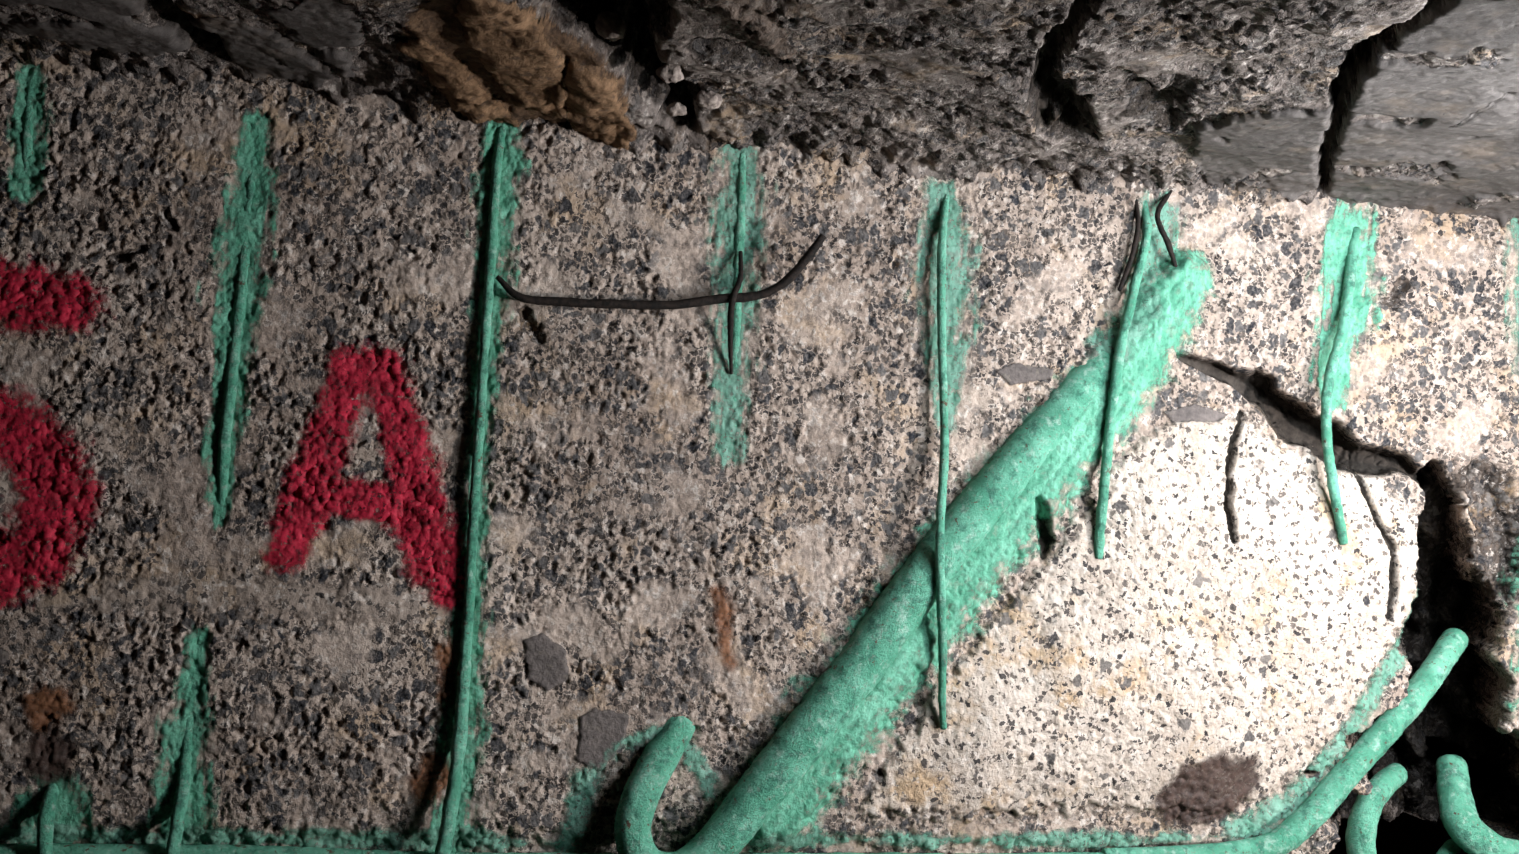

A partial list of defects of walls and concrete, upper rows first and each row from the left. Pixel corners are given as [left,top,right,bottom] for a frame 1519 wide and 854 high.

spalling [1379,275,1412,312]
flaking render [997,363,1054,385]
flaking render [1165,404,1228,422]
spalling [1033,497,1052,559]
spalling [1336,451,1519,830]